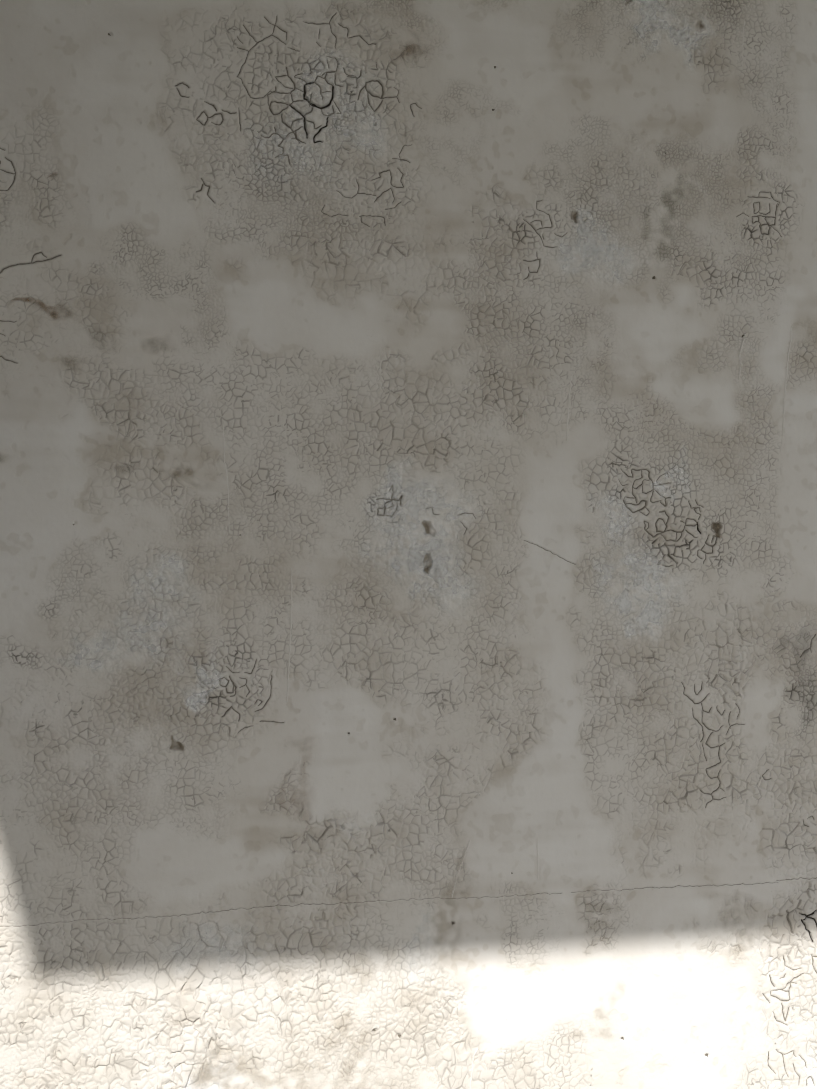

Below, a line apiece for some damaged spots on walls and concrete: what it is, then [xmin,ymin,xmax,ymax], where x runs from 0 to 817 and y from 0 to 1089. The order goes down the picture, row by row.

crack [175,14,422,164]
crack [321,145,410,226]
crack [738,192,782,237]
crack [0,252,61,273]
crack [376,485,476,534]
crack [621,469,717,567]
crack [219,662,284,733]
crack [681,682,744,808]
crack [762,910,817,1025]
crack [768,1051,814,1085]